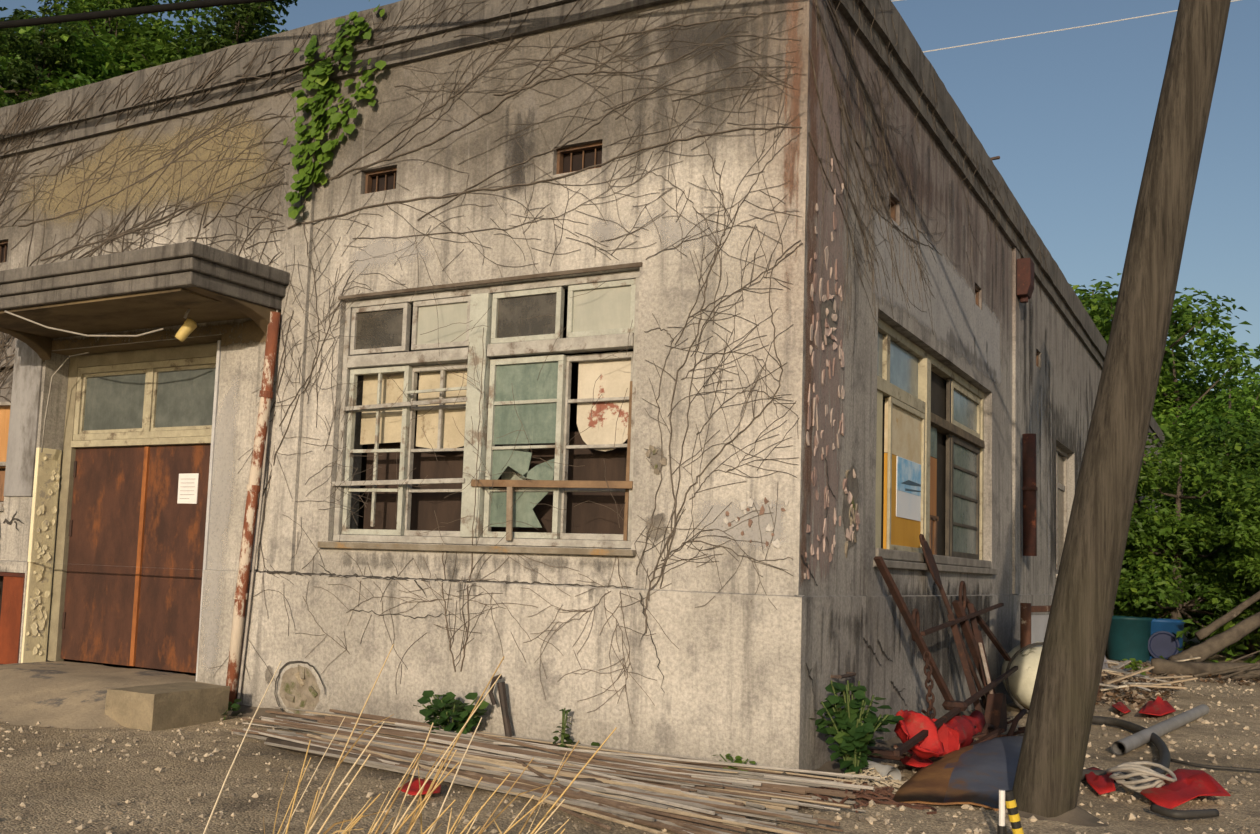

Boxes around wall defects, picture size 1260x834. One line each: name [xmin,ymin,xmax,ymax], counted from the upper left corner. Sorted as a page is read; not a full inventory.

damp [510,133,525,191]
peeling [804,30,860,579]
damp [1024,299,1093,583]
crack [250,564,664,697]